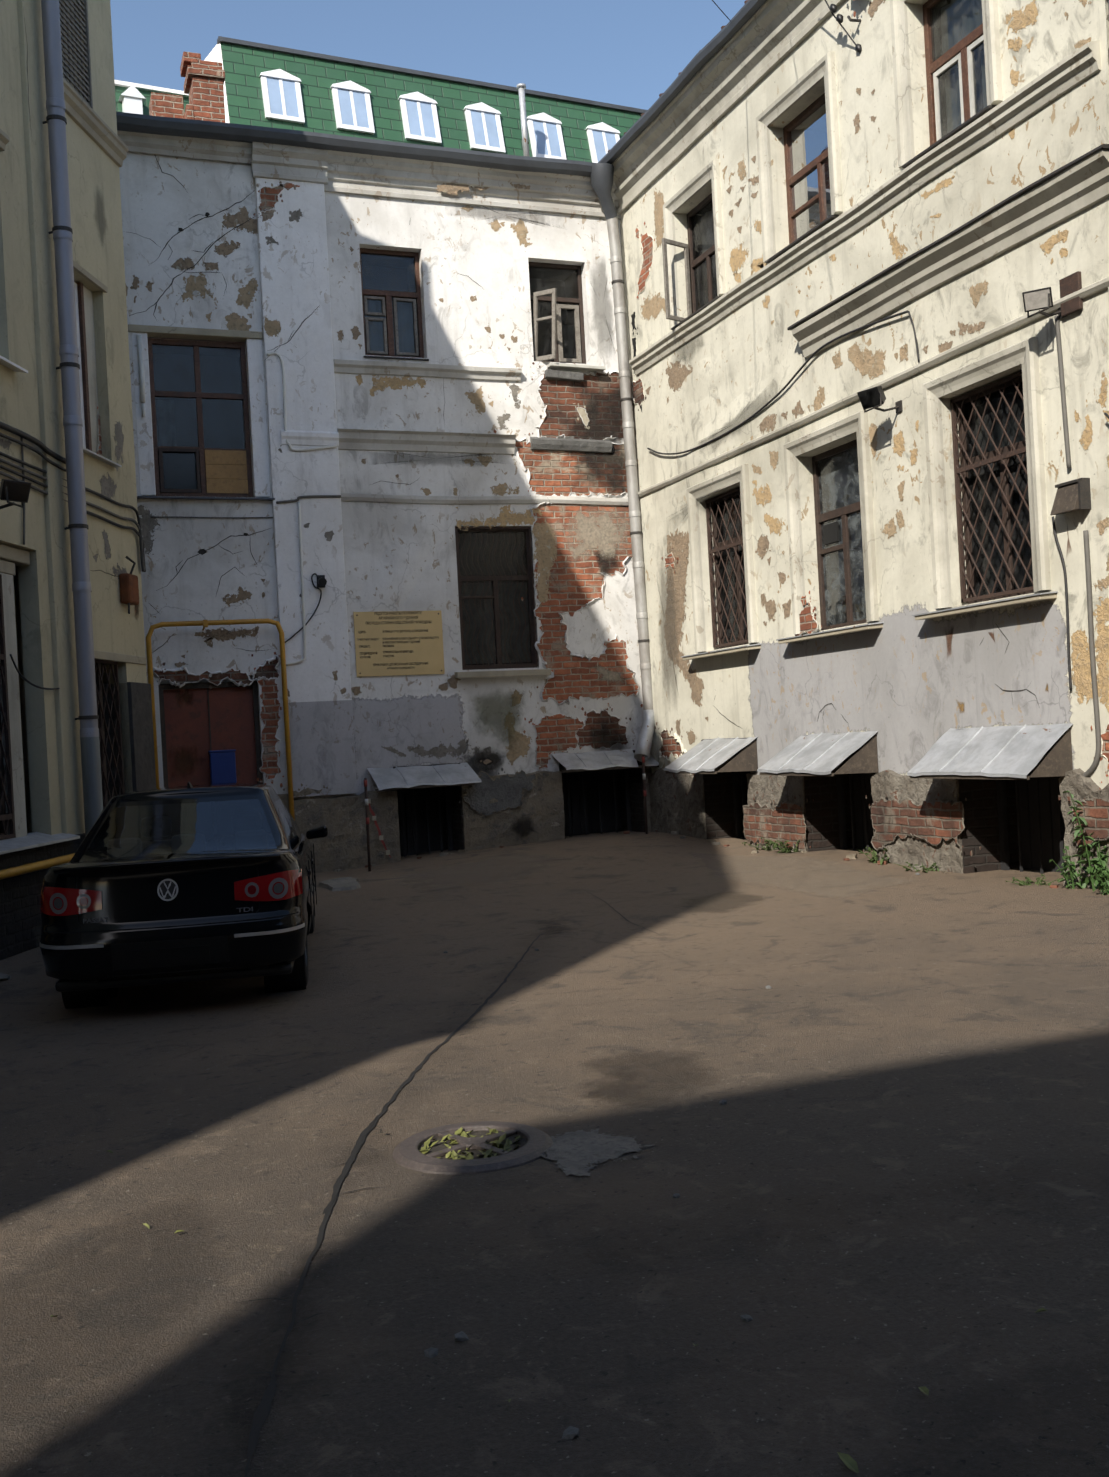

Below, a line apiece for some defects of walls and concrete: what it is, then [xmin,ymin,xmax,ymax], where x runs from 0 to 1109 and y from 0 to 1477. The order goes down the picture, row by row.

crack [129,154,256,317]
spalling [171,181,303,337]
spalling [832,281,989,383]
flaking render [381,188,693,826]
peeling [1096,517,1109,535]
spalling [153,626,328,799]
peeling [332,670,362,695]
spalling [655,528,708,767]
flaking render [1058,553,1109,860]